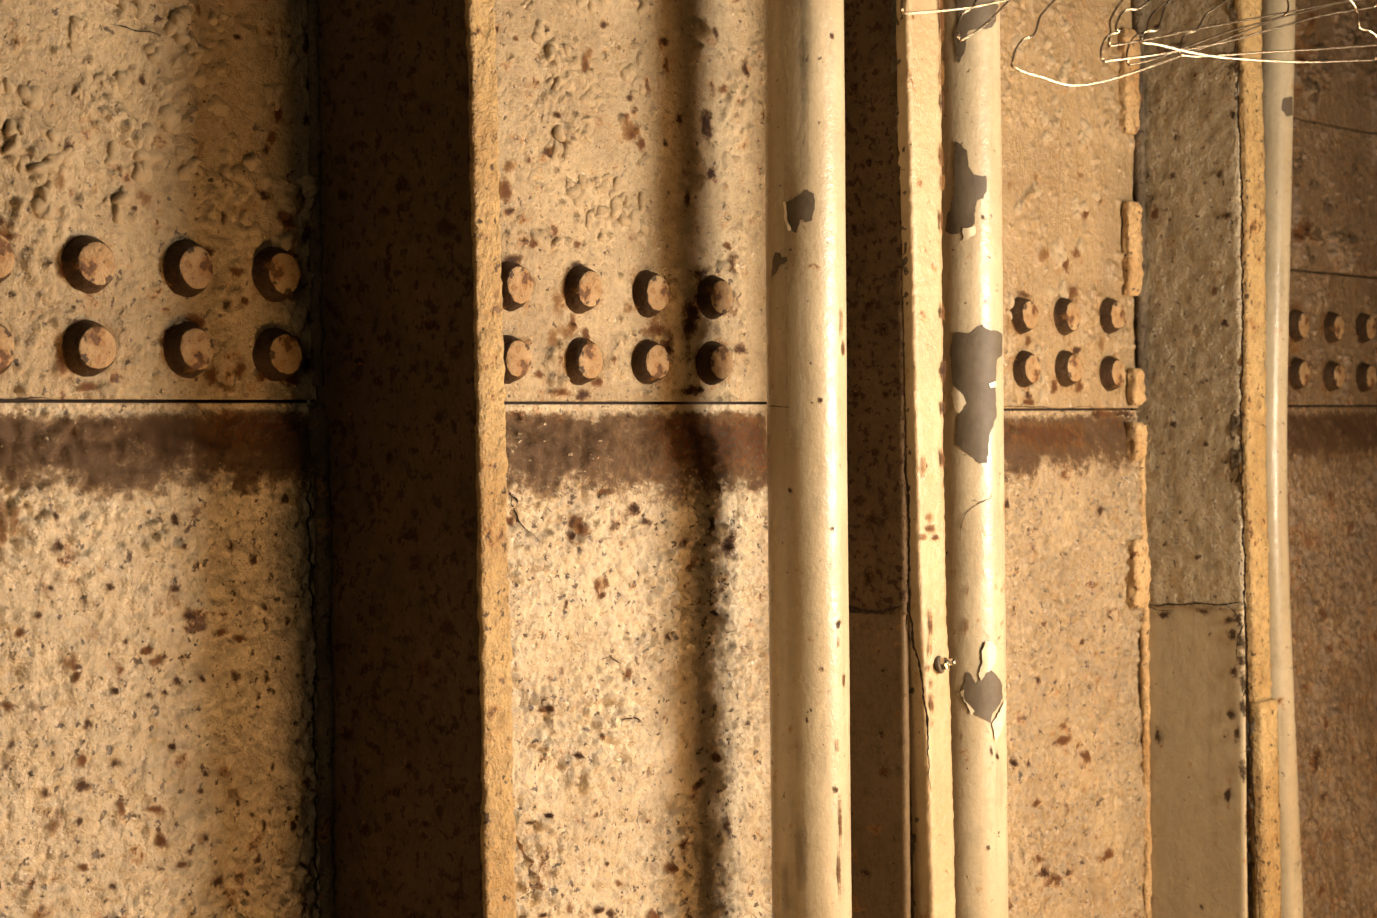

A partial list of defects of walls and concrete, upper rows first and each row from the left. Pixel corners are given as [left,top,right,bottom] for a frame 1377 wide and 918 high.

peeling [954,0,999,63]
rust [0,218,21,241]
rust [257,185,317,268]
rust [501,239,538,264]
peeling [783,189,815,233]
peeling [945,141,987,242]
rust [78,383,98,391]
peeling [950,325,1003,464]
crack [306,468,321,918]
peeling [960,641,1006,740]